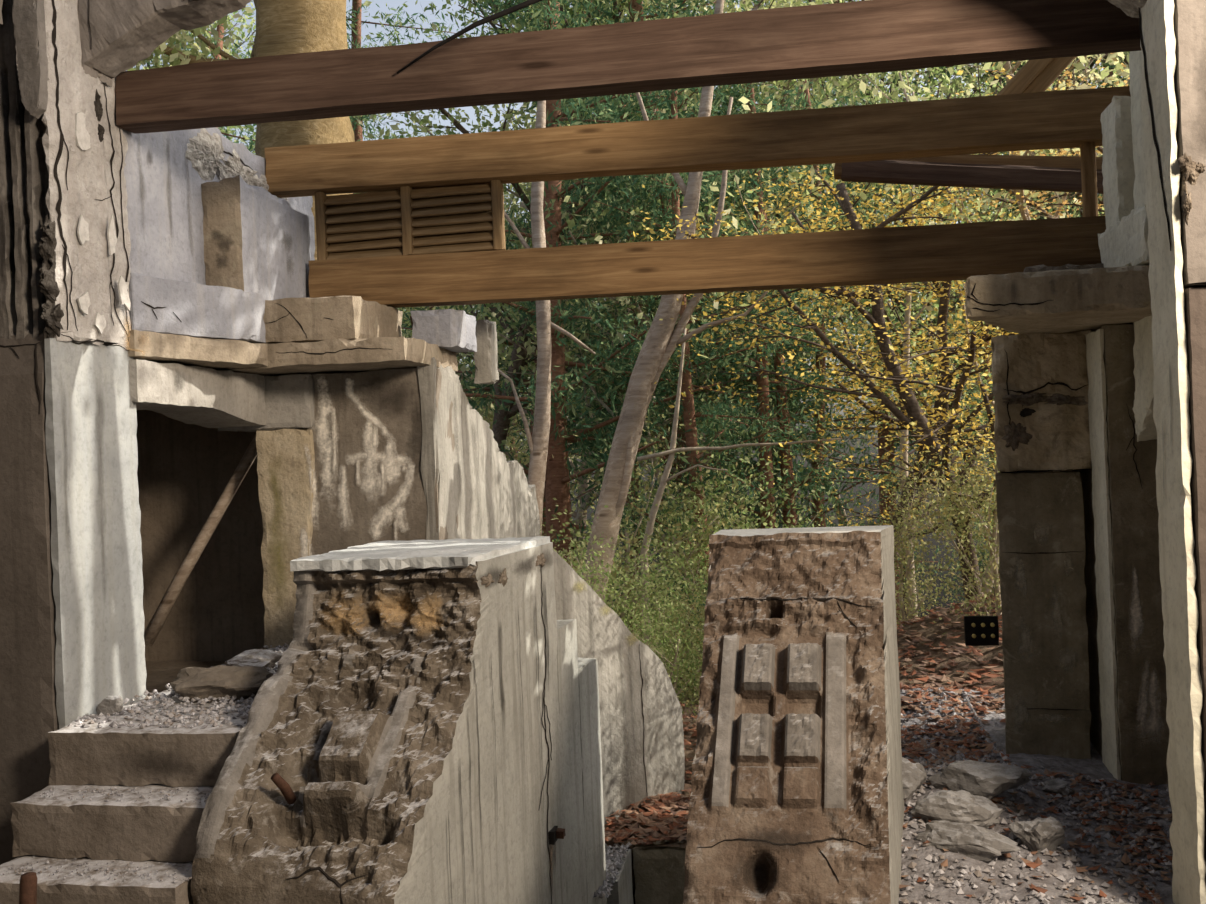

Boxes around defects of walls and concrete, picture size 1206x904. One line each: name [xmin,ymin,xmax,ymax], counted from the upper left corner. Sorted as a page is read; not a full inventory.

peeling [75,88,105,150]
spalling [185,128,288,201]
crack [1138,7,1171,251]
peeling [77,215,89,245]
crack [0,0,181,413]
peeling [107,214,117,255]
spalling [38,214,64,339]
peeling [77,292,106,335]
peeling [117,276,131,311]
crack [966,283,1053,312]
crack [1004,349,1087,425]
crack [539,565,552,904]